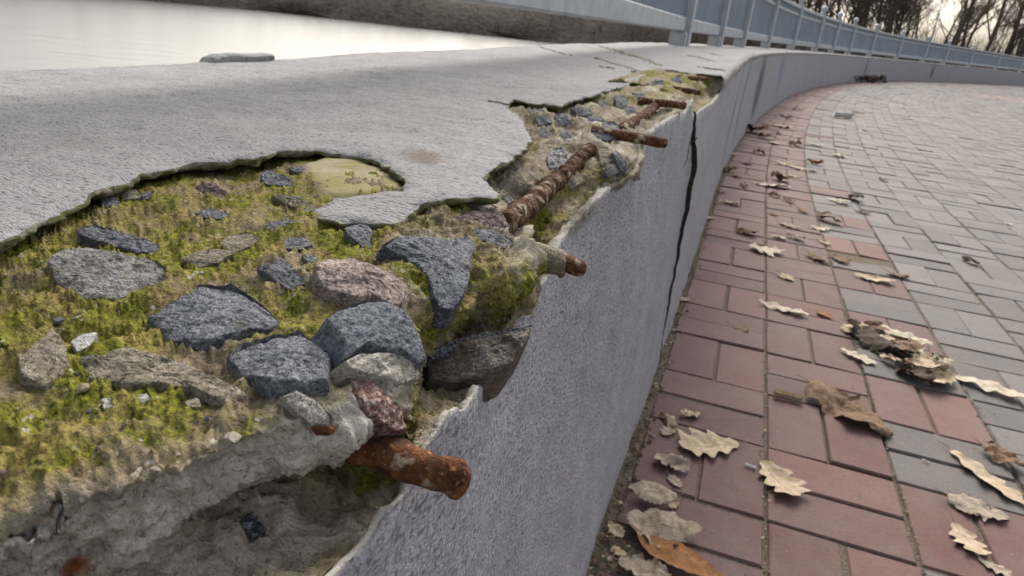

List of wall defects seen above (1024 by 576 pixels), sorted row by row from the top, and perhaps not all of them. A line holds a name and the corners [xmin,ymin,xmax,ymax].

spalling [0,68,722,576]
crack [659,112,698,363]